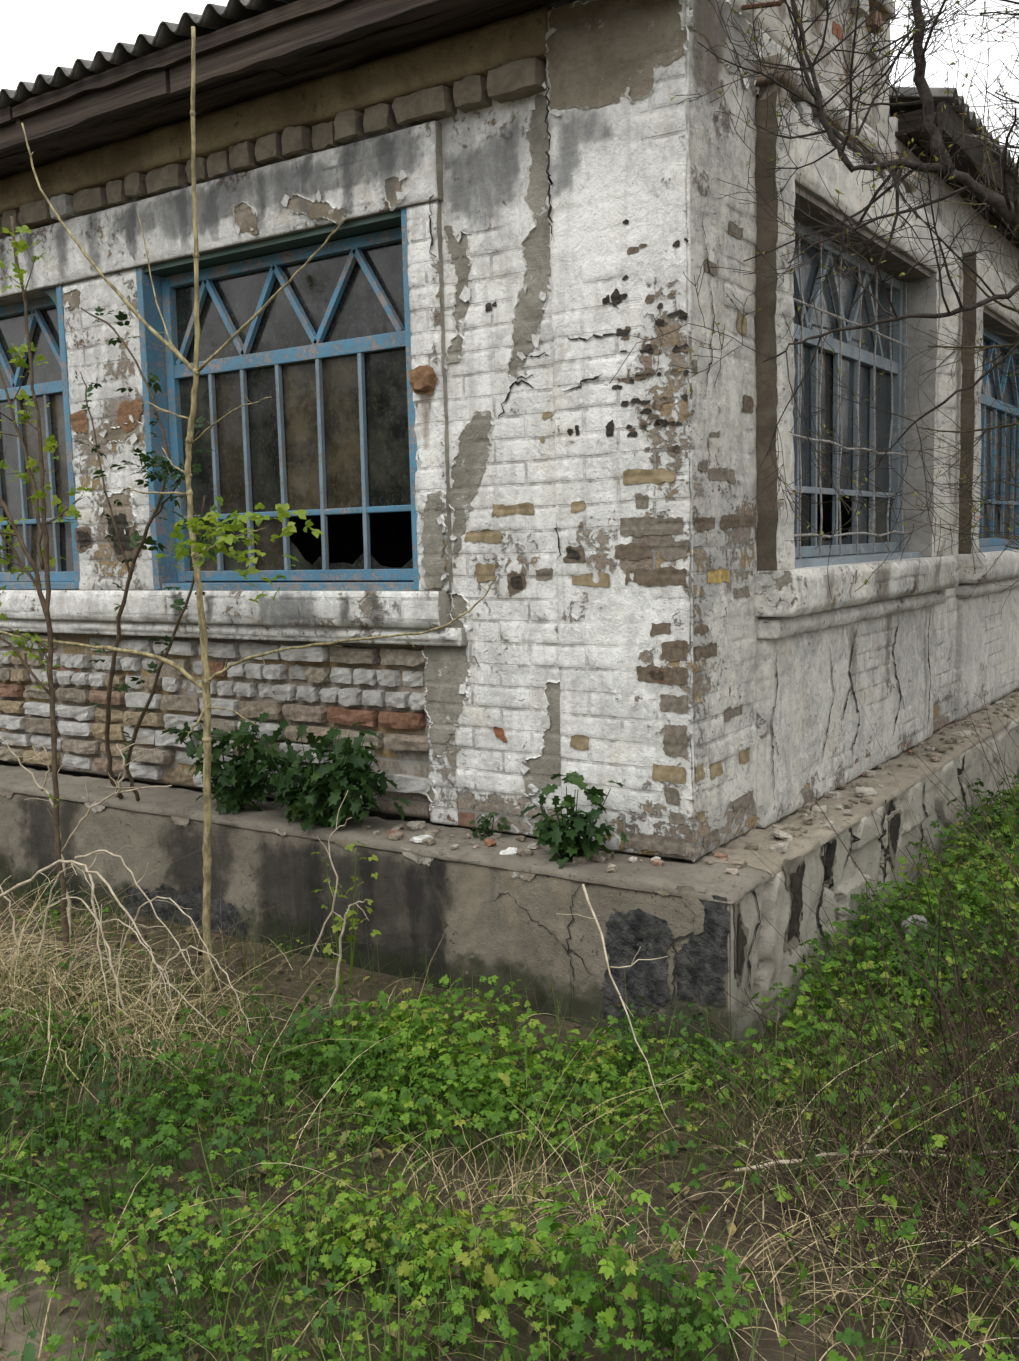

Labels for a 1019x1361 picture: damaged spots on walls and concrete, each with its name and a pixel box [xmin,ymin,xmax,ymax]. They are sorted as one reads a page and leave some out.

crack [498,296,629,418]
spalling [566,326,755,587]
peeling [419,410,535,811]
spalling [475,563,553,589]
peeling [518,679,589,797]
spalling [624,622,723,856]
crack [771,649,779,800]
crack [820,628,860,766]
crack [892,607,931,734]
water stain [241,844,782,1071]
crack [481,877,596,996]
spalling [783,856,806,955]